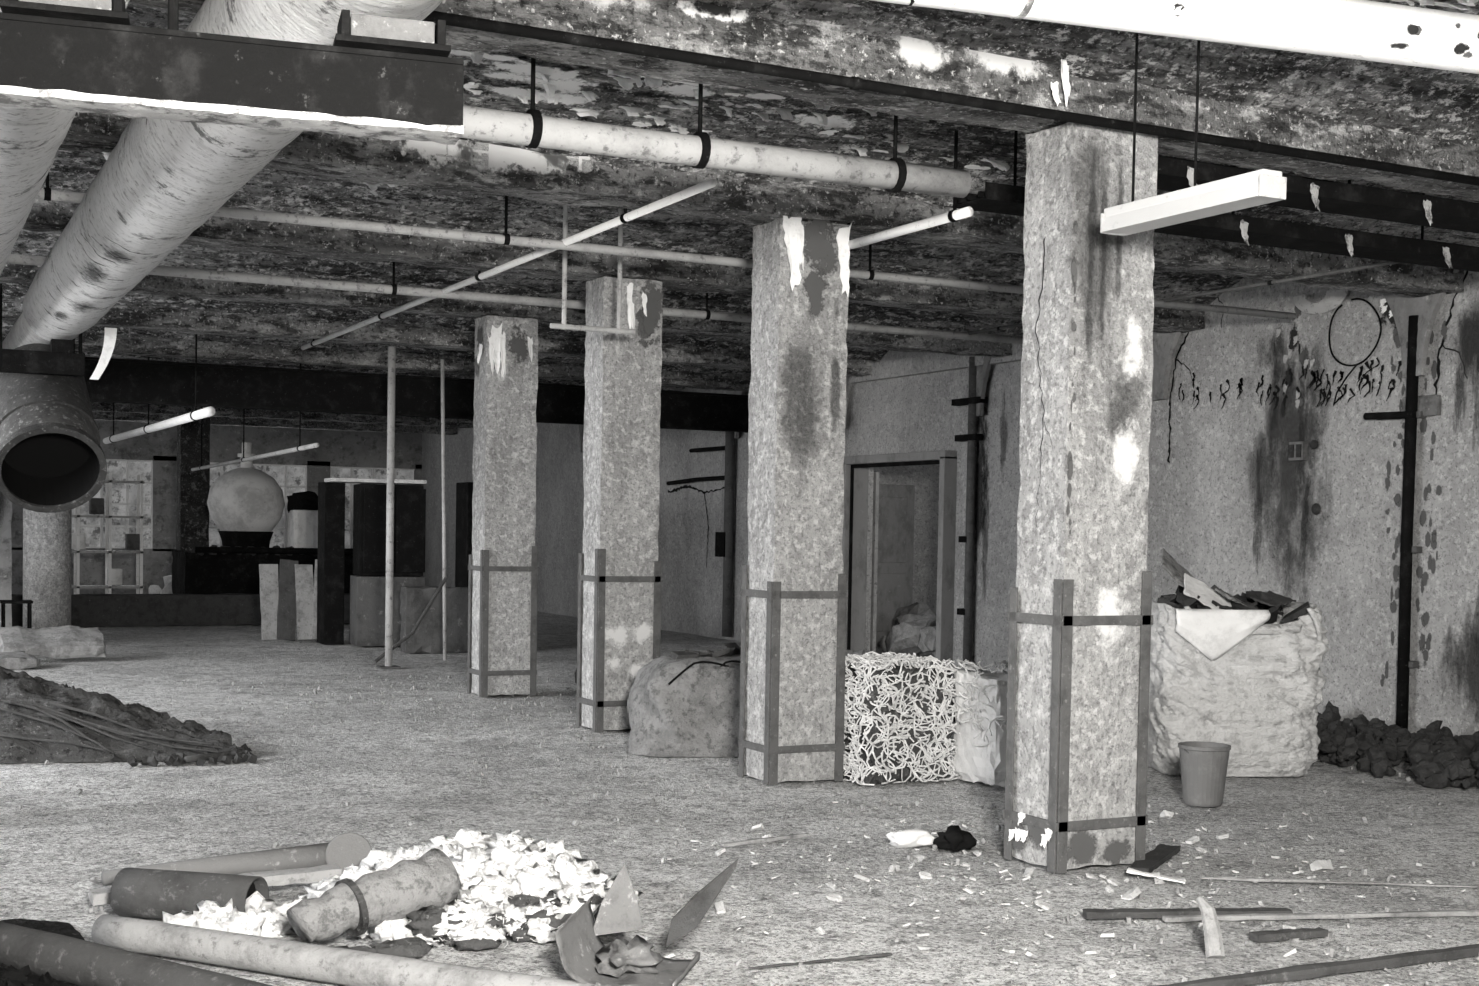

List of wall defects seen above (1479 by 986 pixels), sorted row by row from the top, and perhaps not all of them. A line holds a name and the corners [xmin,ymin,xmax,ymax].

peeling [1391,0,1479,58]
peeling [450,50,910,156]
peeling [1051,59,1071,107]
water stain [1123,318,1143,377]
spalling [1425,321,1447,392]
water stain [1462,317,1479,366]
water stain [1113,420,1140,484]
spalling [1178,299,1442,669]
water stain [1093,587,1131,647]
spalling [1380,631,1394,687]